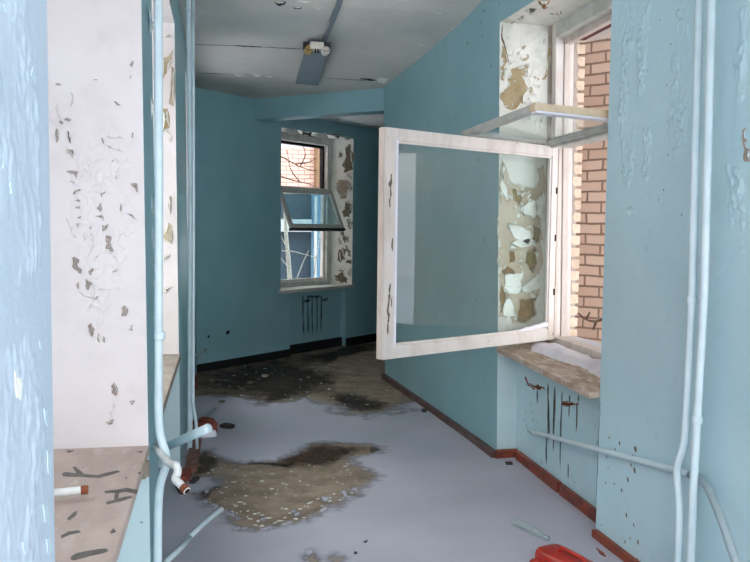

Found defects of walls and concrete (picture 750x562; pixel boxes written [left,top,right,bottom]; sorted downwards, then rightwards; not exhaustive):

peeling [163,49,175,142]
peeling [500,39,552,110]
peeling [96,192,113,252]
peeling [163,196,174,244]
peeling [285,128,355,283]
peeling [497,160,547,324]
peeling [72,256,94,290]
rust [302,295,328,332]
leakage [204,345,369,401]
leakage [335,394,386,411]
leakage [247,446,379,467]
rust [545,387,579,483]